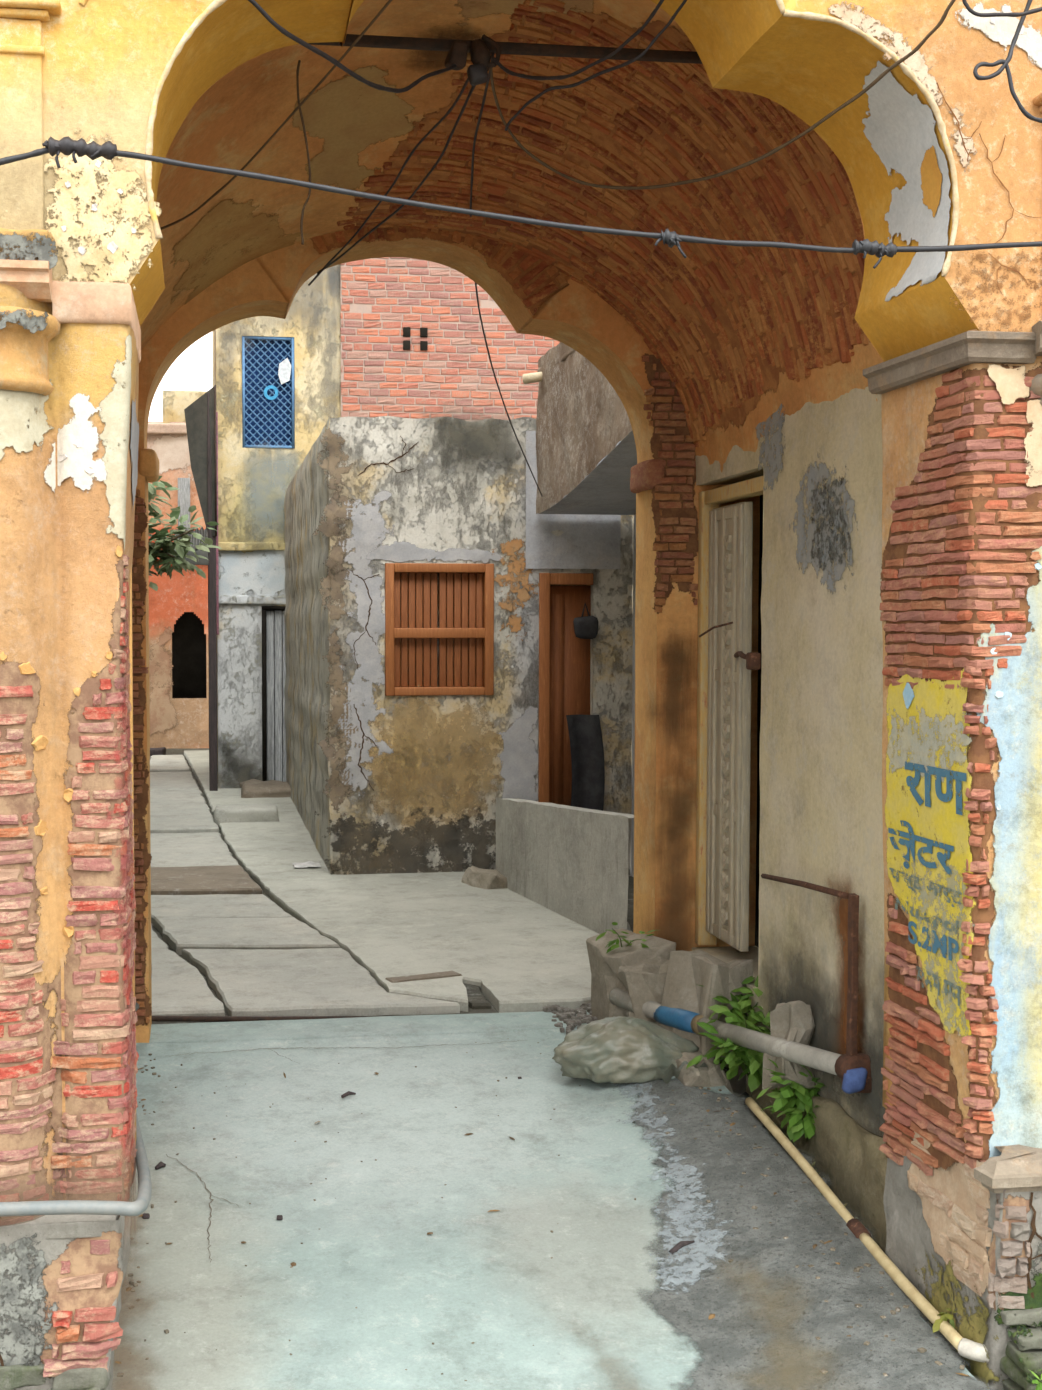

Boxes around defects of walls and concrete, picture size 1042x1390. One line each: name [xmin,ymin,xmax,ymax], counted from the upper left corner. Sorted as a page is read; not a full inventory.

peeling [44,128,162,289]
flaking render [292,0,871,614]
peeling [828,0,1042,332]
crack [937,82,1039,295]
peeling [218,550,285,596]
peeling [313,428,394,818]
water stain [810,477,851,571]
flaking render [0,335,194,1202]
water stain [315,807,496,875]
flaking render [879,362,1042,1311]
spalling [586,928,815,1096]
flaking render [40,1230,124,1377]